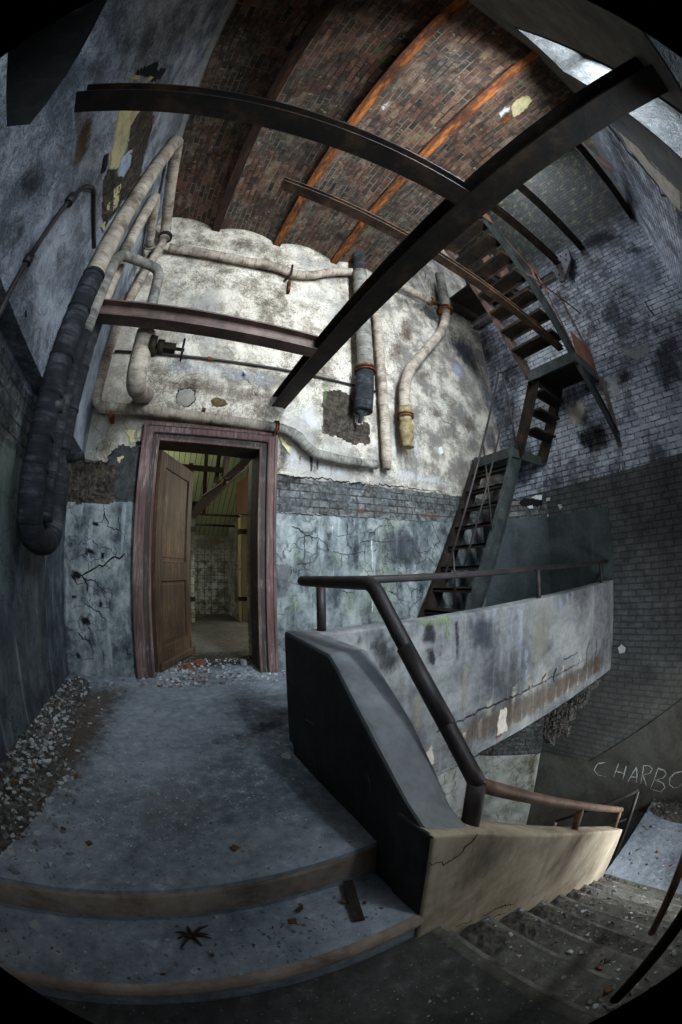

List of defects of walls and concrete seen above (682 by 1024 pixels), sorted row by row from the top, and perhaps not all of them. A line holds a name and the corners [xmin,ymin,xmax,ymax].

flaking render [129,61,166,83]
flaking render [101,111,153,231]
flaking render [322,389,371,446]
flaking render [68,430,142,504]
crack [71,505,132,665]
crack [276,512,449,605]
leakage [474,622,491,645]
crack [429,834,478,866]